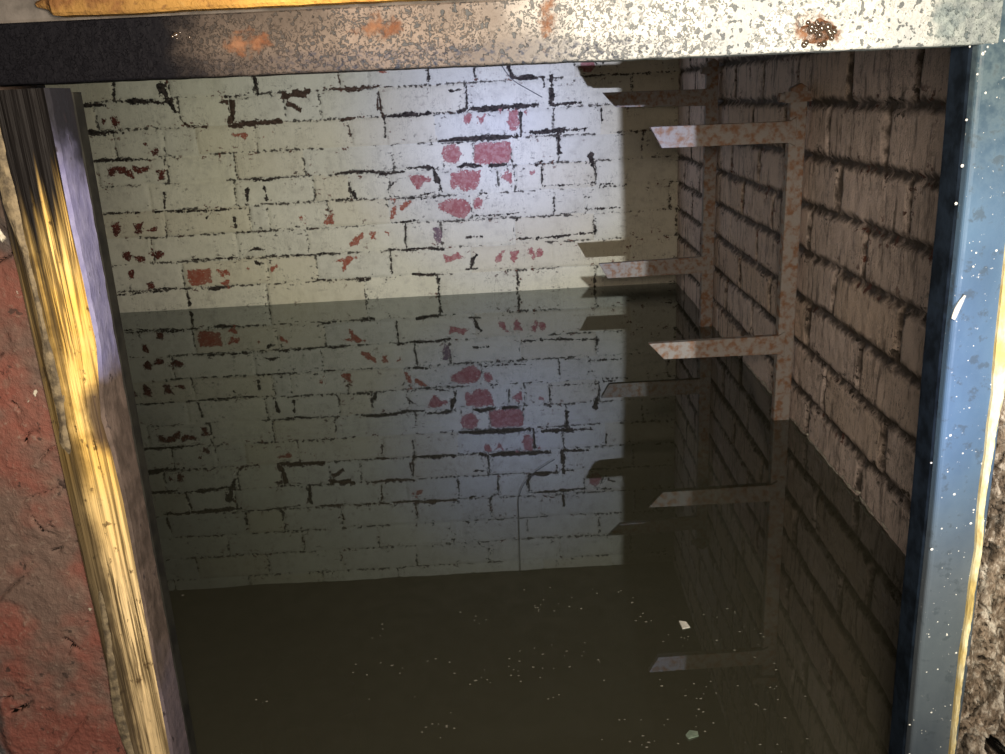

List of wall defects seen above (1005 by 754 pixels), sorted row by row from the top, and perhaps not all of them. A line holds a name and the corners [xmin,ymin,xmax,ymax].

corrosion [542,0,553,36]
corrosion [796,18,840,48]
peeling [107,142,166,181]
peeling [438,108,528,219]
peeling [133,221,158,235]
peeling [122,250,164,280]
peeling [187,268,230,289]